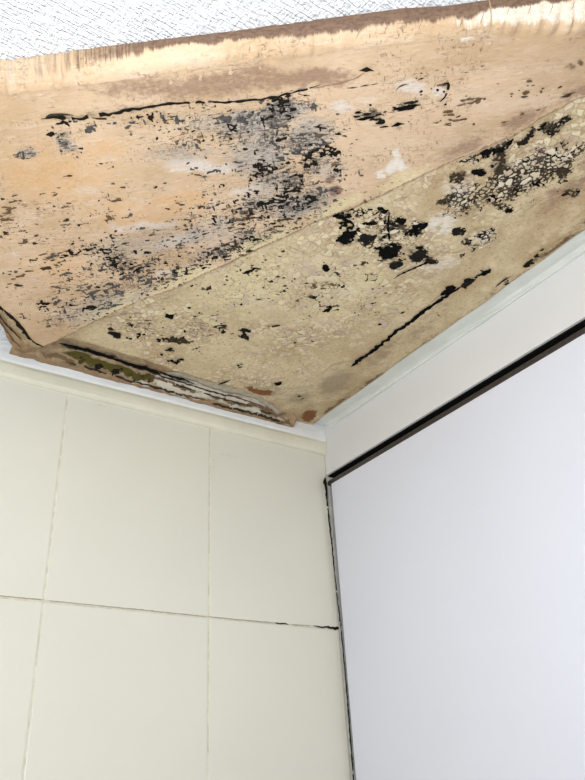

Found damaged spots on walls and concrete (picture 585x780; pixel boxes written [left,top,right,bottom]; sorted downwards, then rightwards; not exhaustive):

peeling [490,0,585,34]
crack [43,67,374,120]
peeling [320,94,381,115]
peeling [387,75,449,101]
damp [0,0,585,426]